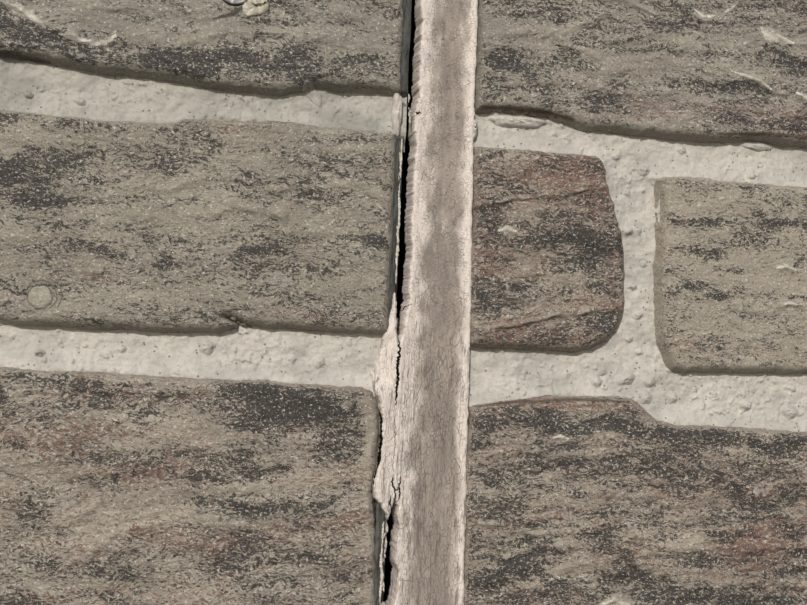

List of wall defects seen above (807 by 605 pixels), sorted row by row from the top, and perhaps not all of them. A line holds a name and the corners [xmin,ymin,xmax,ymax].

crack [373,0,472,605]